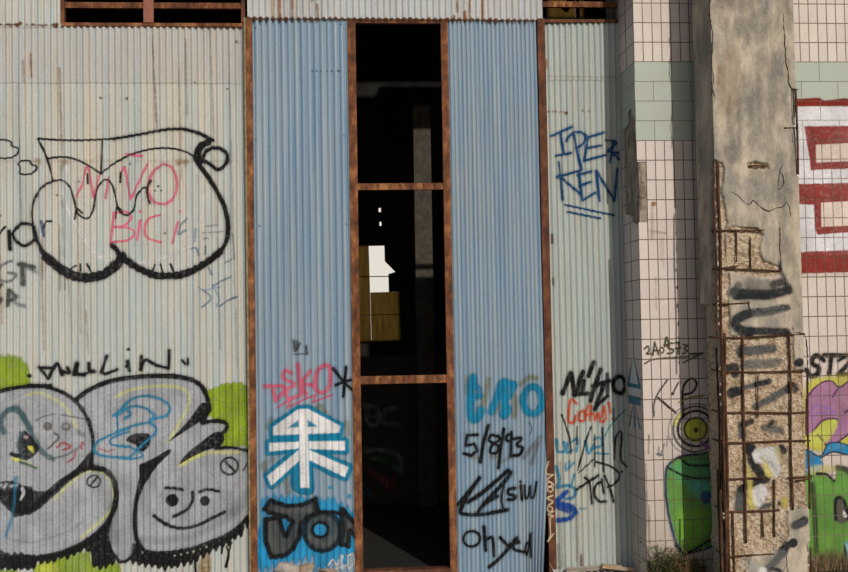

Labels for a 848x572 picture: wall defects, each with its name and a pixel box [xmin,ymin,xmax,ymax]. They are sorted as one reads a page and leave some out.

spalling [704,161,813,572]
crack [733,167,791,276]